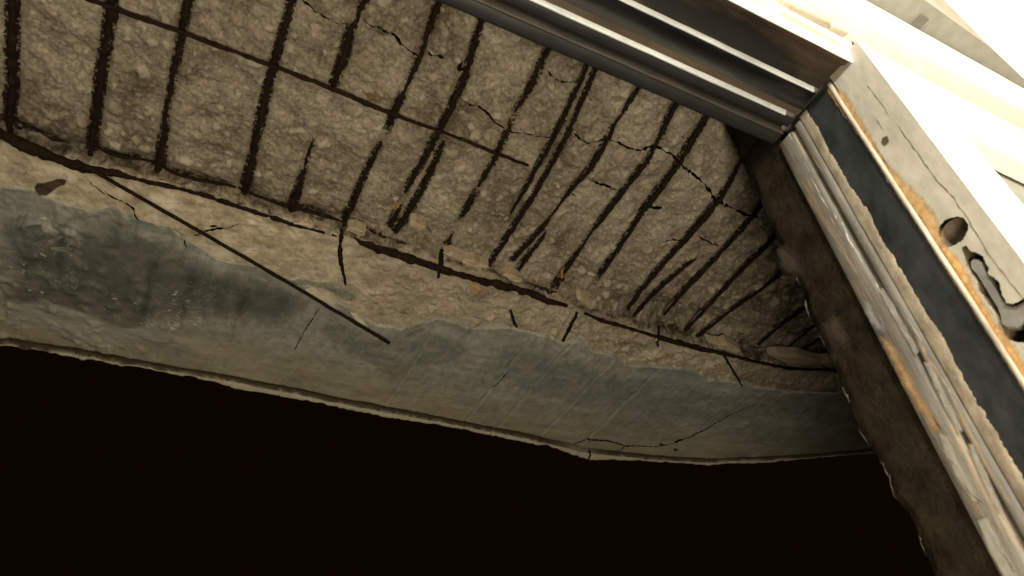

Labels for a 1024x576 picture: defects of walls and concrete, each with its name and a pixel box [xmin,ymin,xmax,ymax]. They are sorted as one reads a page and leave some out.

water stain [7,218,294,343]
spalling [0,0,843,393]
crack [460,97,759,218]
crack [661,236,719,247]
corrosion [827,88,1024,377]
crack [575,403,758,460]